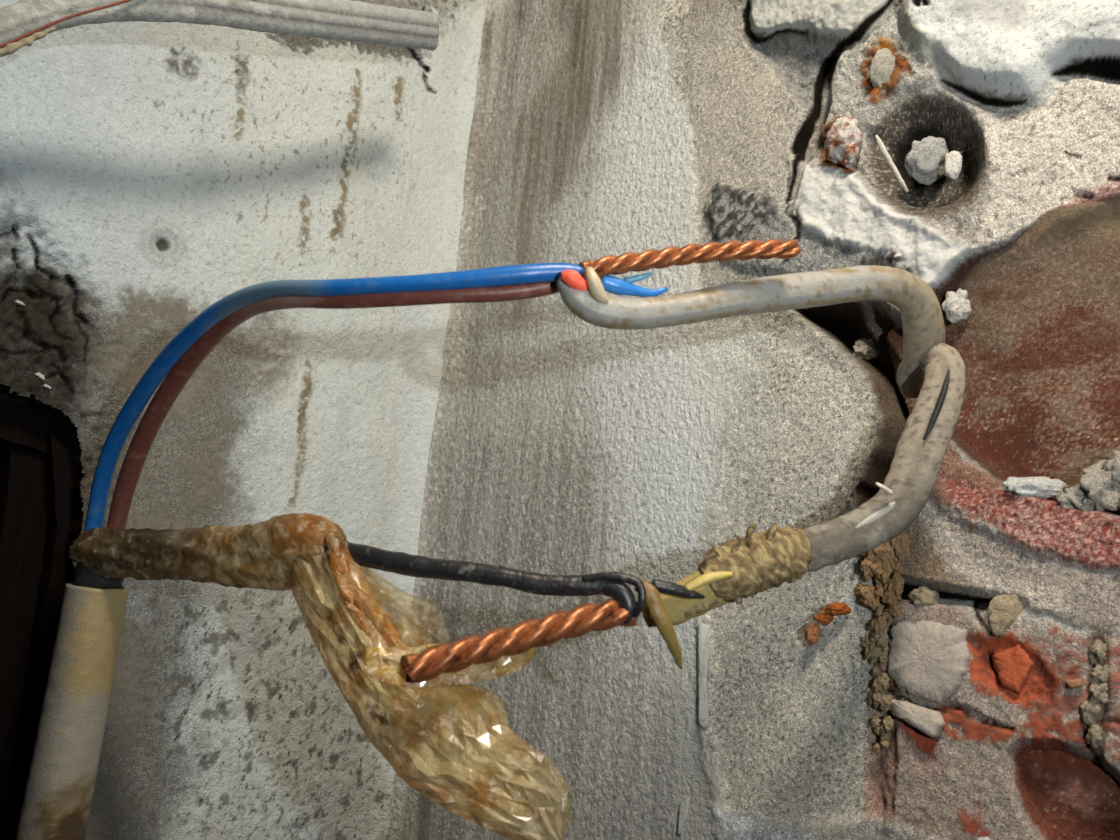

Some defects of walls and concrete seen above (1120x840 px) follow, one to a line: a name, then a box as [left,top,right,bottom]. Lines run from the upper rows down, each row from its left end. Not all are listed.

spalling [744,32,838,110]
rust [861,38,912,103]
spalling [937,75,1120,250]
crack [0,226,90,393]
spalling [698,314,876,557]
spalling [698,532,1120,840]